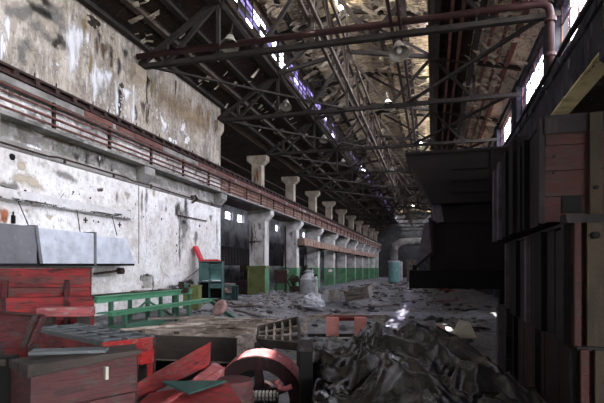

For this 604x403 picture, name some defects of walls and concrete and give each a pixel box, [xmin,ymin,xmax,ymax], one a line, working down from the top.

damp [0,0,128,102]
damp [109,85,148,123]
peeling [156,109,190,149]